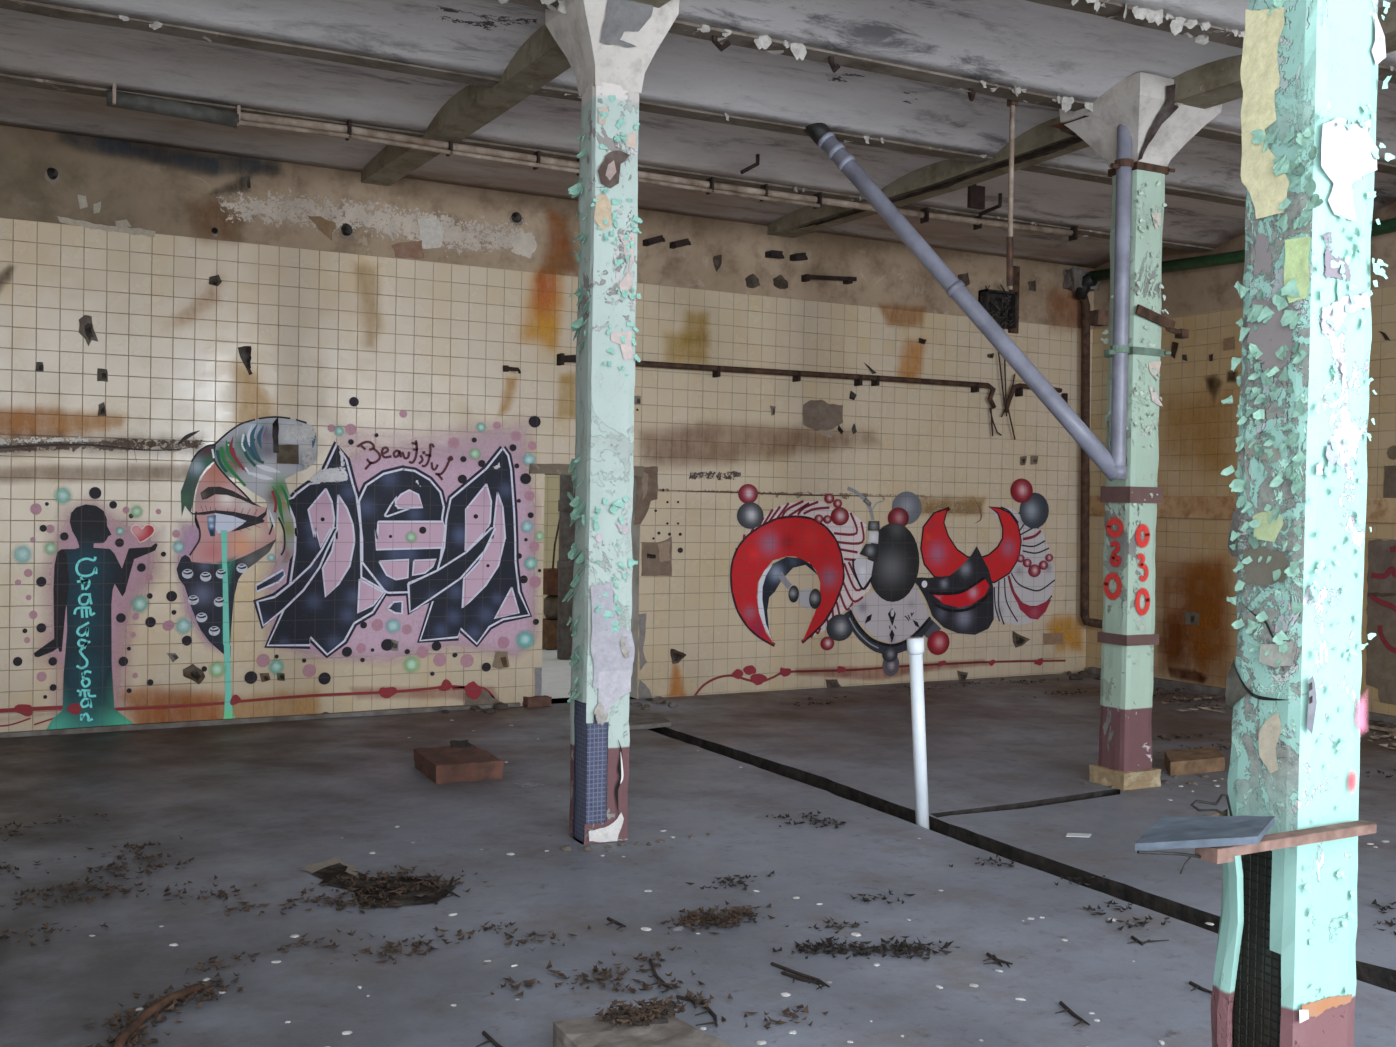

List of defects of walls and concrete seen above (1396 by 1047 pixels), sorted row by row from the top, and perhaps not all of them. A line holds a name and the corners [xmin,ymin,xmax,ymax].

peeling [540,0,566,14]
spalling [600,0,653,48]
peeling [693,24,732,42]
peeling [754,35,807,60]
peeling [952,80,1028,103]
spalling [890,95,1093,203]
spalling [568,95,643,299]
peeling [212,186,538,259]
peeling [1071,0,1396,708]
peeling [1013,631,1063,648]
peeling [1259,713,1282,774]
spalling [589,813,624,842]